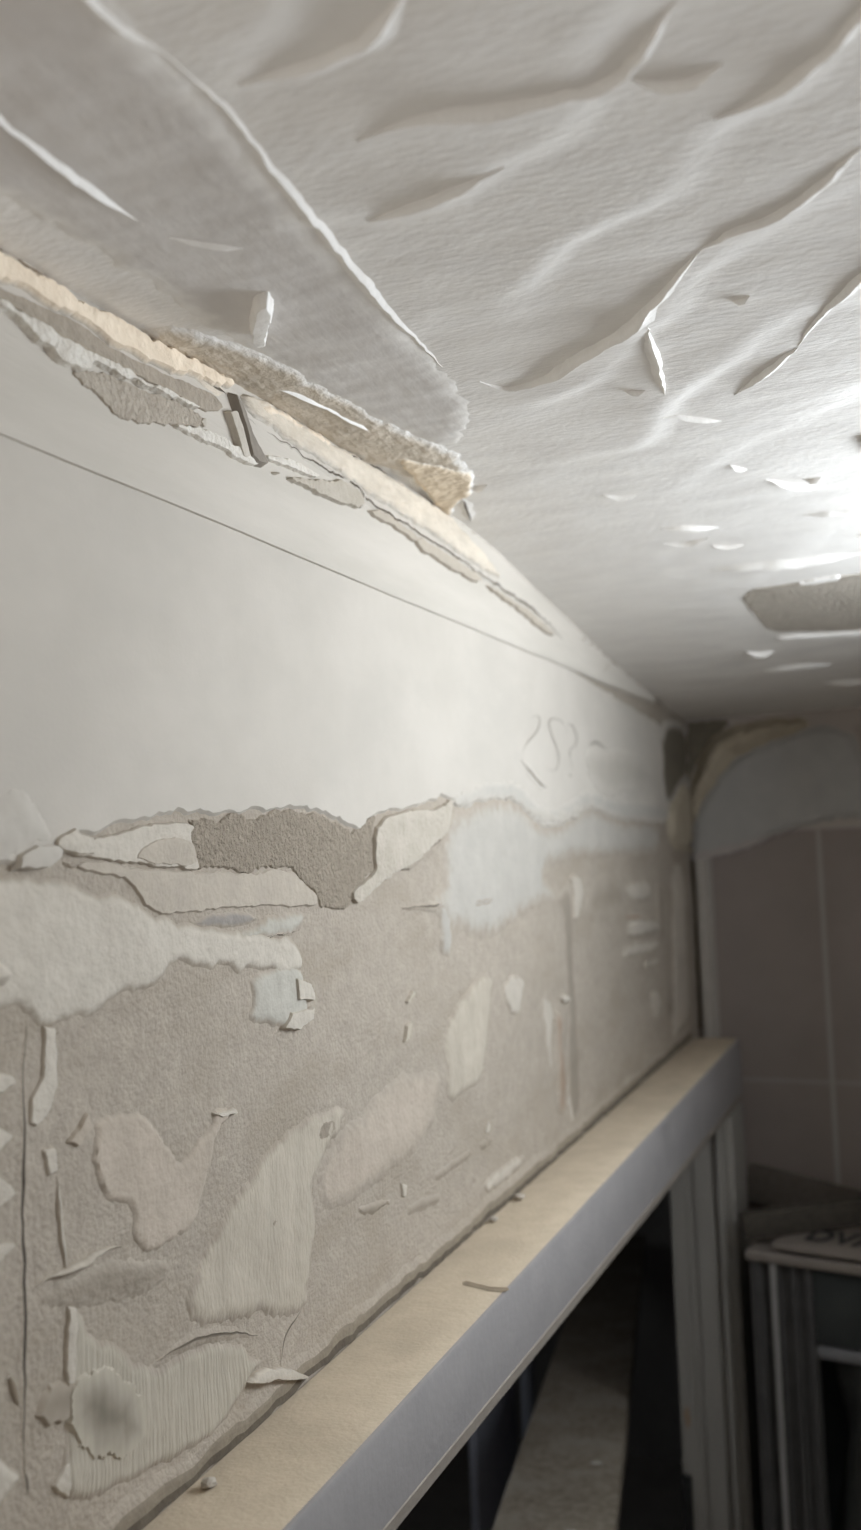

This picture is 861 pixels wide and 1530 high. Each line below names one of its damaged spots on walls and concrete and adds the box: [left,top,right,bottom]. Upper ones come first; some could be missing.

peeling [0,288,500,578]
spalling [743,573,861,641]
peeling [0,799,453,1127]
peeling [622,880,660,970]
peeling [0,1129,13,1149]
peeling [0,1178,15,1206]
crack [13,1026,33,1495]
peeling [33,972,524,1501]
crack [93,859,703,1530]
peeling [0,1459,19,1502]